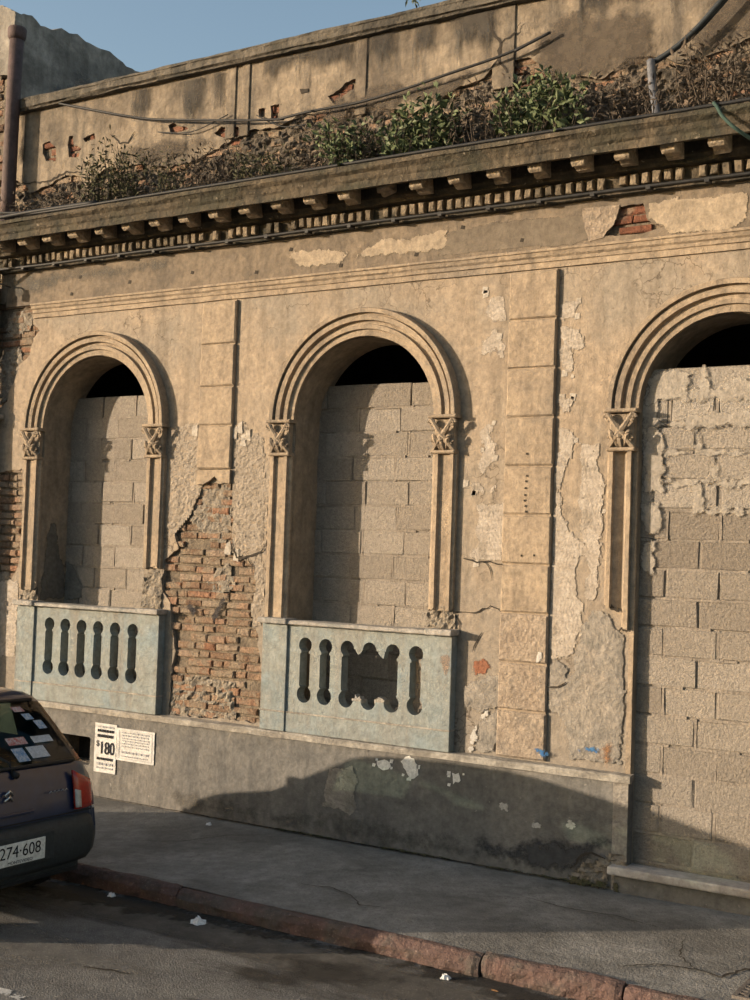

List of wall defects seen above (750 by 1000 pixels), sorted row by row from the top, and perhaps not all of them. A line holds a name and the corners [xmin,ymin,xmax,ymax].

leakage [264,43,351,77]
leakage [455,10,496,60]
leakage [183,72,222,116]
leakage [312,71,469,122]
leakage [118,138,204,163]
spalling [15,40,750,216]
peeling [582,192,748,242]
peeling [640,366,750,534]
flaking render [0,470,23,657]
peeling [141,421,270,723]
peeling [549,427,606,659]
leakage [476,838,610,871]